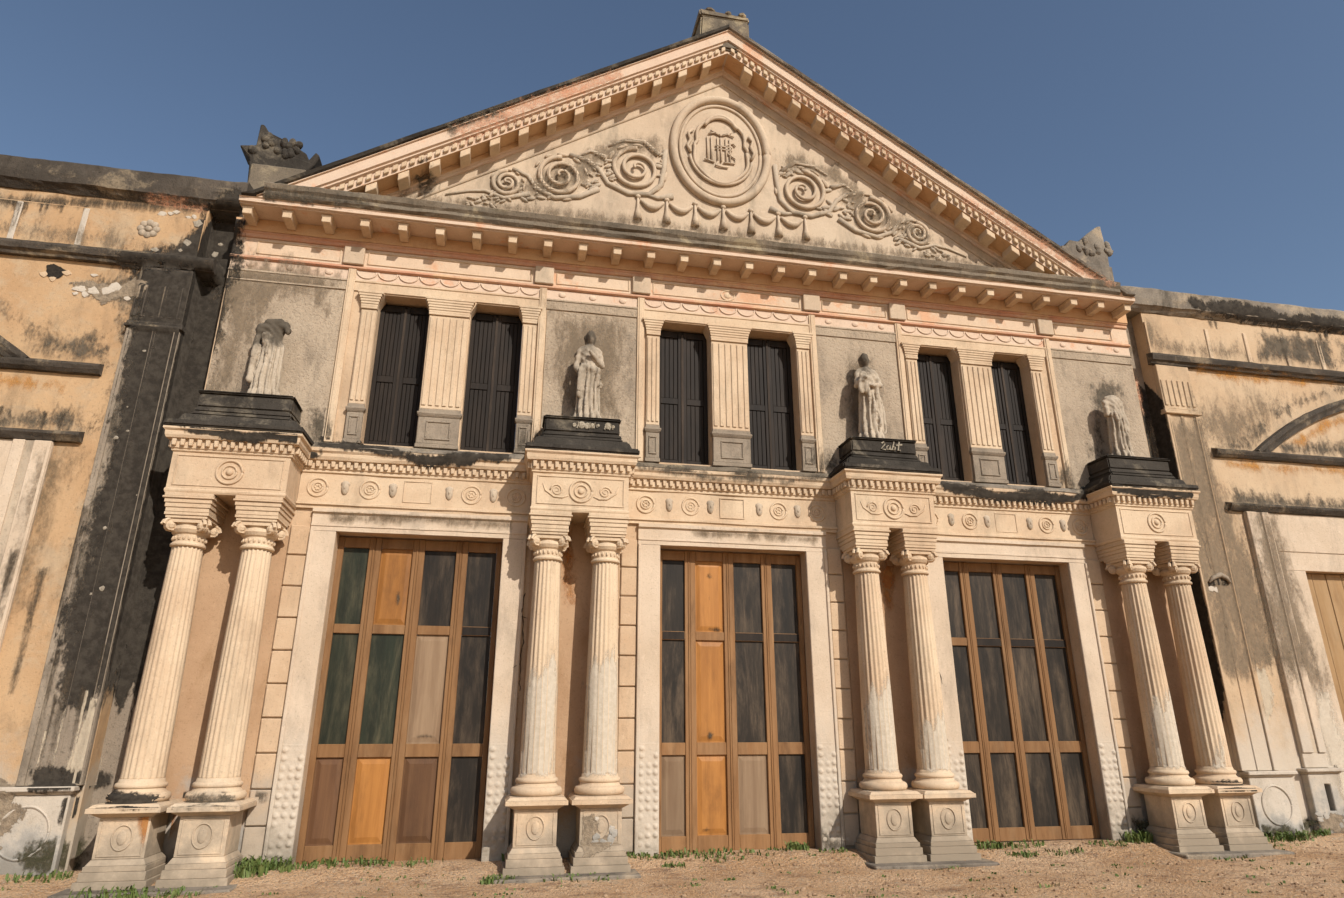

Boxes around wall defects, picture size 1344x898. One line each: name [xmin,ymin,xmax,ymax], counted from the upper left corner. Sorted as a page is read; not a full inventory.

flaking render [39,264,148,305]
damp [1188,296,1344,367]
damp [1194,392,1344,457]
damp [0,185,543,811]
damp [1234,488,1344,510]
flaking render [0,778,27,850]
spalling [581,814,618,858]